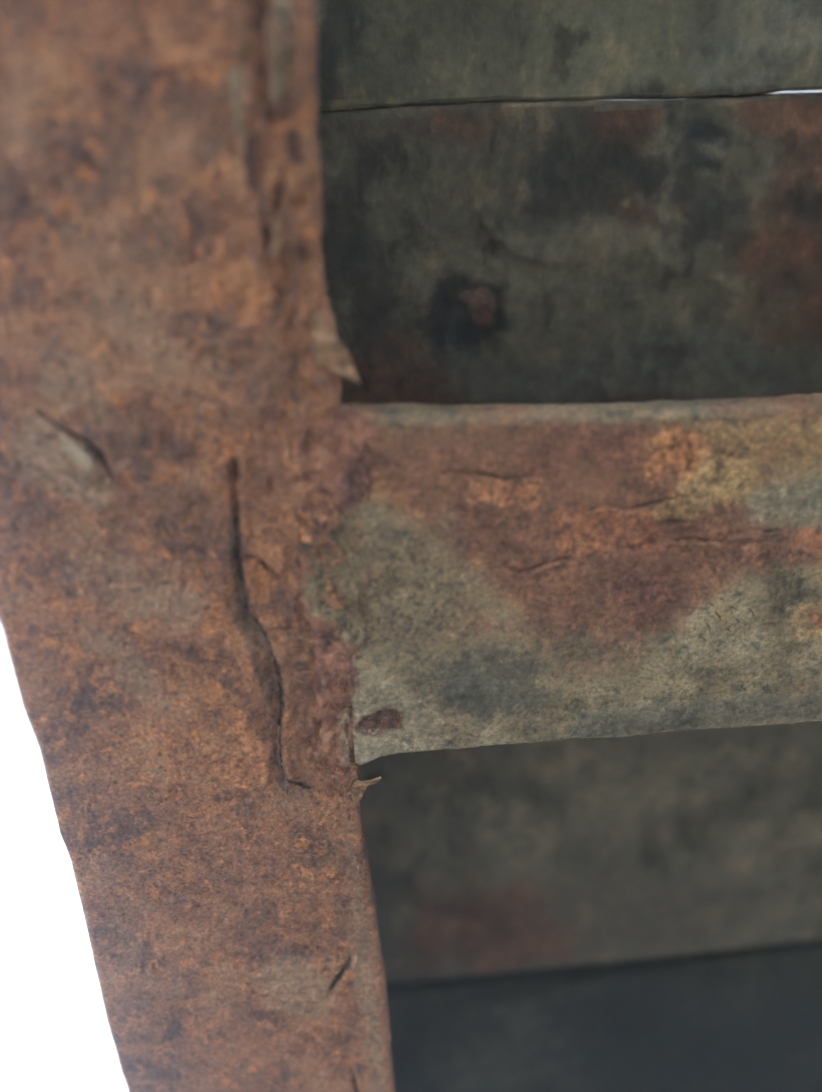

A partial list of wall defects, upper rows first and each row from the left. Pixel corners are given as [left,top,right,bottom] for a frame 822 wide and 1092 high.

water stain [315,0,386,107]
water stain [636,0,822,92]
water stain [318,103,822,405]
rust [311,308,428,404]
rust [361,415,822,661]
crack [588,495,780,547]
crack [225,434,311,798]
rust [350,777,381,806]